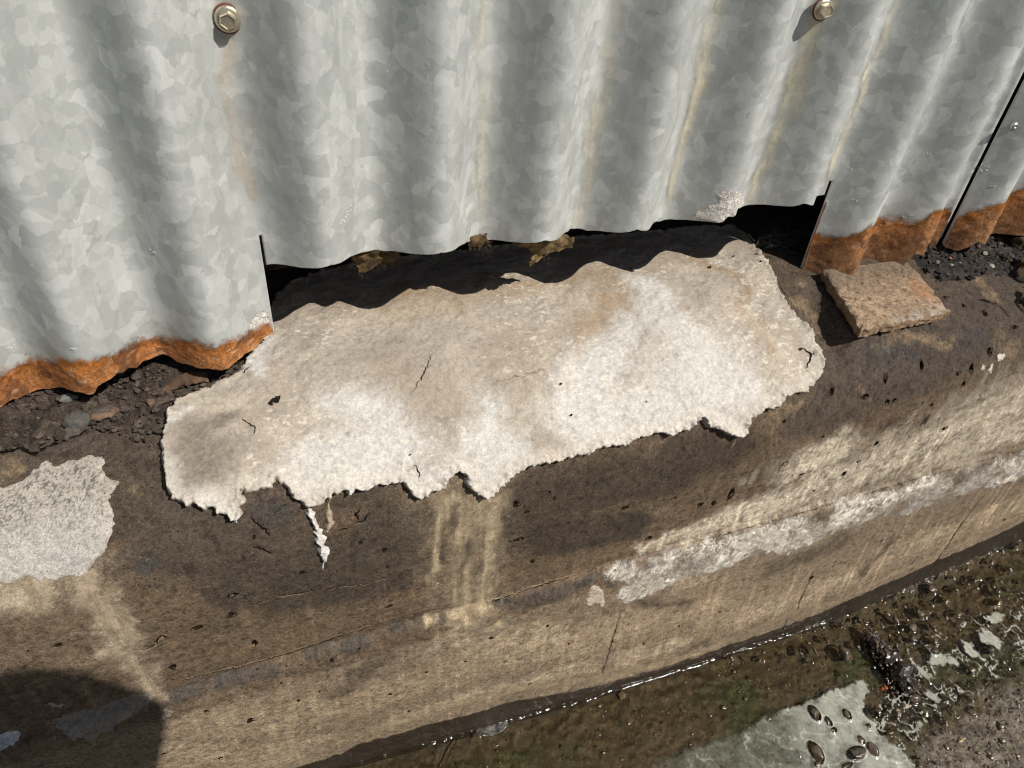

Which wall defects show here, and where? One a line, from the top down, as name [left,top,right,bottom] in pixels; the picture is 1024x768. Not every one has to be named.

rust [802,188,1024,276]
rust [0,323,273,407]
peeling [161,224,826,570]
peeling [0,455,119,584]
damp [422,489,504,631]
crack [133,503,834,695]
damp [606,451,1024,604]
crack [865,449,1023,495]